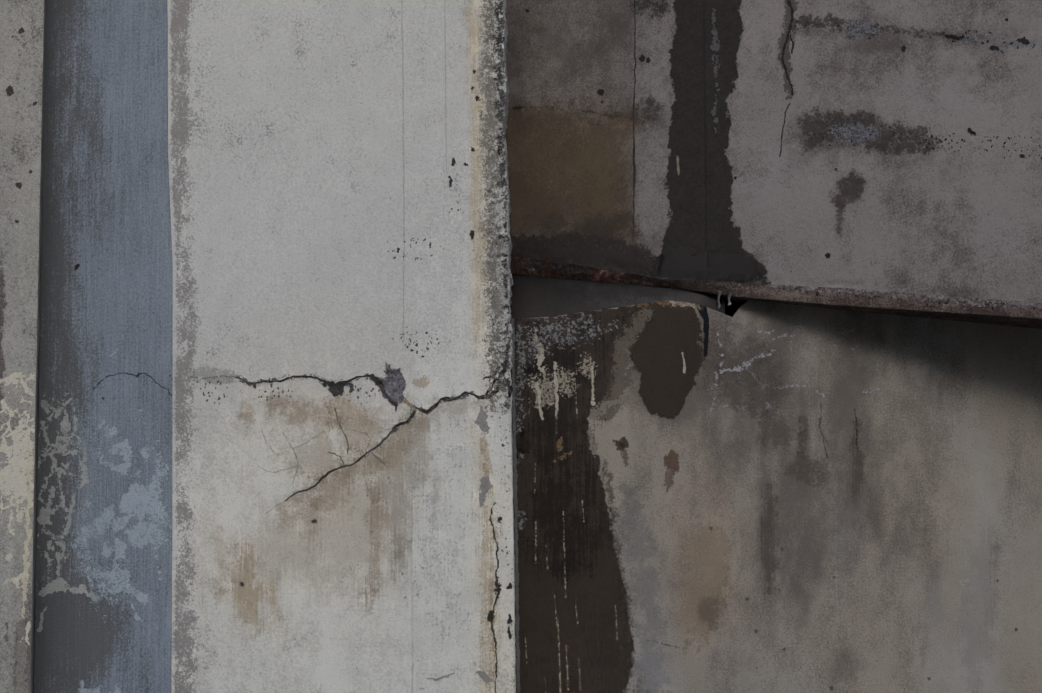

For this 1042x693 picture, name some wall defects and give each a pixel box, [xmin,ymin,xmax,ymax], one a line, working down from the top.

water stain [649,0,771,285]
crack [777,0,798,157]
crack [93,373,172,400]
crack [235,361,513,502]
water stain [477,0,705,693]
corrosion [628,300,702,310]
water stain [710,329,860,413]
crack [487,502,502,693]